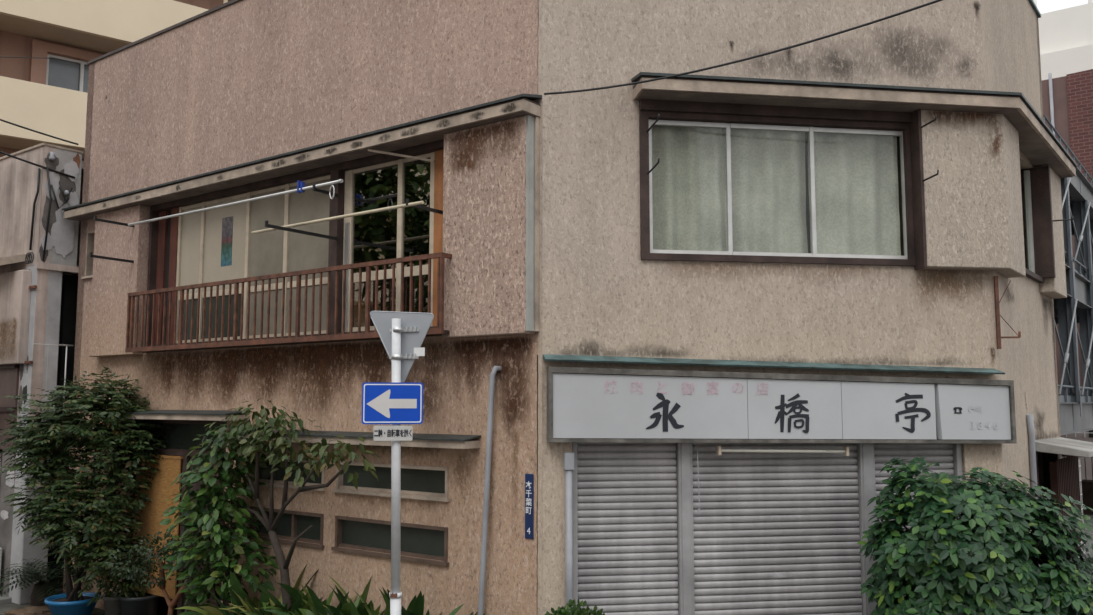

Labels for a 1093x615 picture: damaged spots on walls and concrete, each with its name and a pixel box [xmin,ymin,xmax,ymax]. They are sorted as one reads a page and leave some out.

water stain [453,122,514,169]